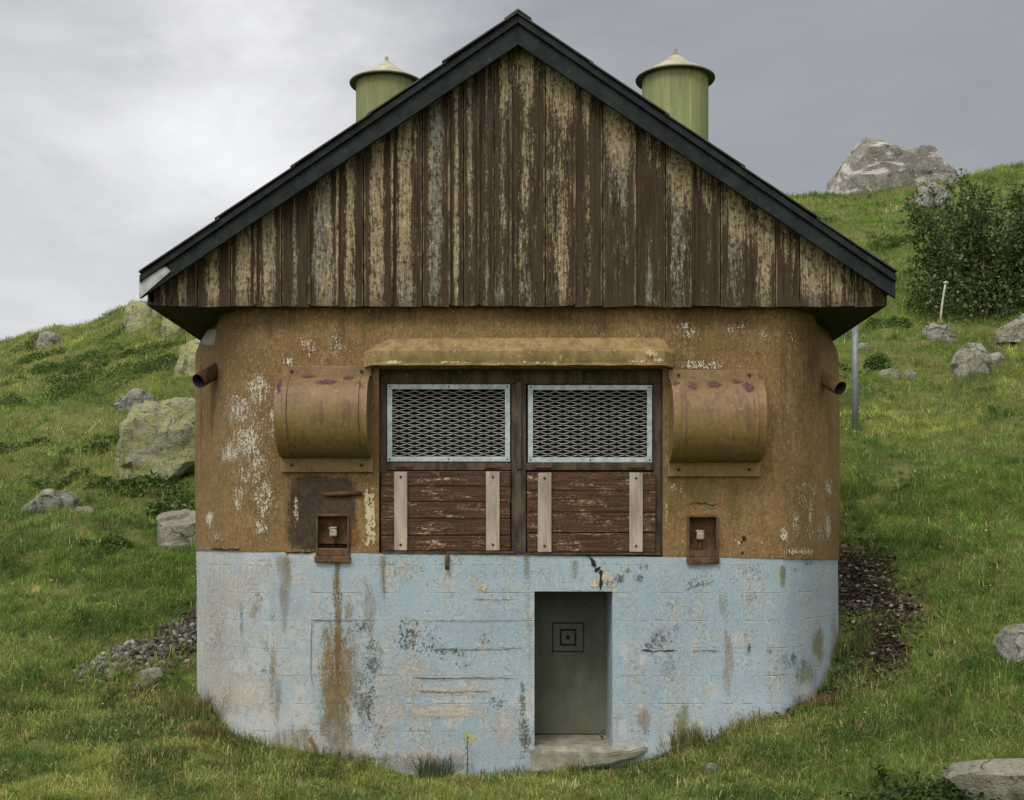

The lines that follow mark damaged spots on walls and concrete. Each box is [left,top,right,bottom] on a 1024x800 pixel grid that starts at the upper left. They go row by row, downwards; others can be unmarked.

peeling [216,371,282,537]
peeling [780,475,832,556]
crack [584,555,603,591]
rust [322,563,357,744]
damp [394,618,467,669]